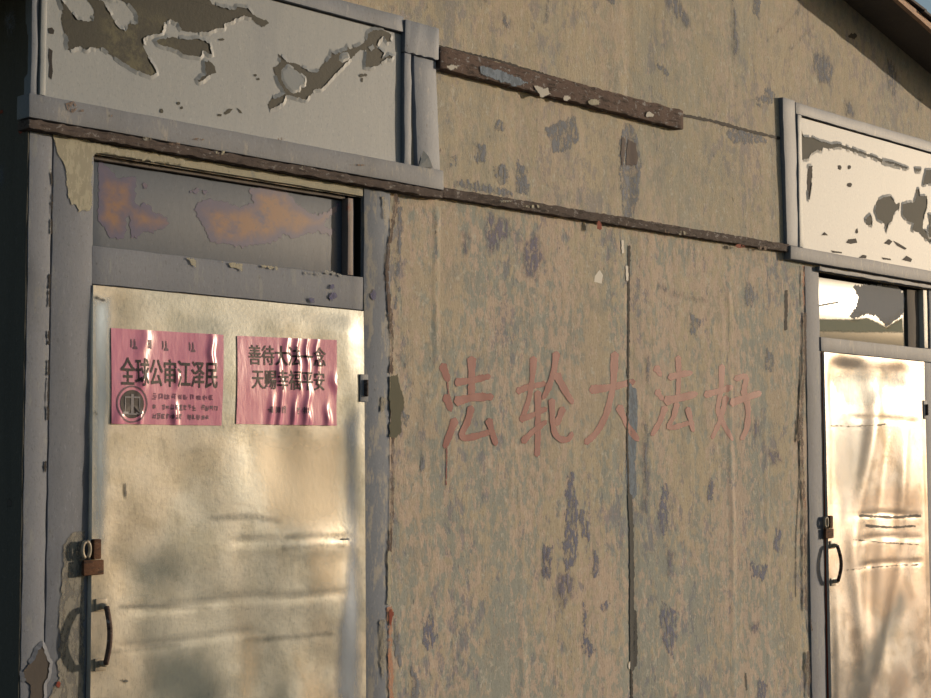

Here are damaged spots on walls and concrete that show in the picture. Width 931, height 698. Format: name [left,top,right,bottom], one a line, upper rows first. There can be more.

peeling [48,0,269,86]
peeling [268,27,395,113]
peeling [618,125,642,218]
peeling [802,129,931,262]
peeling [19,531,86,698]